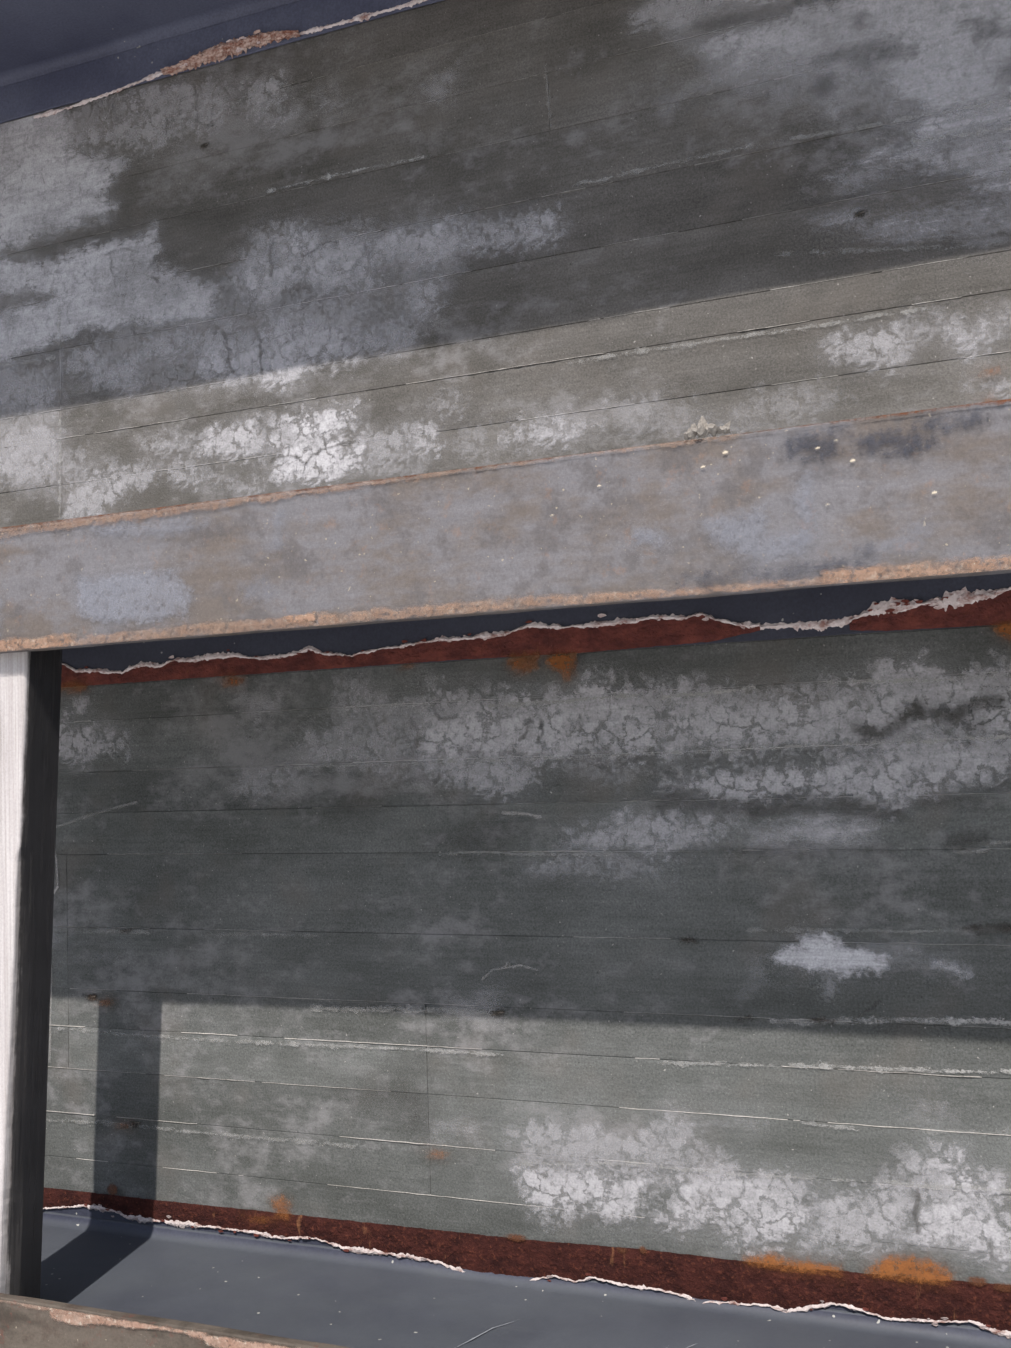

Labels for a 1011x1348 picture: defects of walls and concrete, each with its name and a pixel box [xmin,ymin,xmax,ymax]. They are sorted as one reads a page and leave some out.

rust [160,30,300,76]
peeling [211,0,427,57]
water stain [703,0,1011,188]
efflorescence [0,84,377,389]
efflorescence [198,400,440,486]
rust [0,555,1011,692]
peeling [740,616,853,632]
water stain [415,657,1011,842]
efflorescence [774,932,890,978]
rust [43,1184,1011,1339]
efflorescence [512,1165,654,1220]
efflorescence [655,1148,1011,1271]